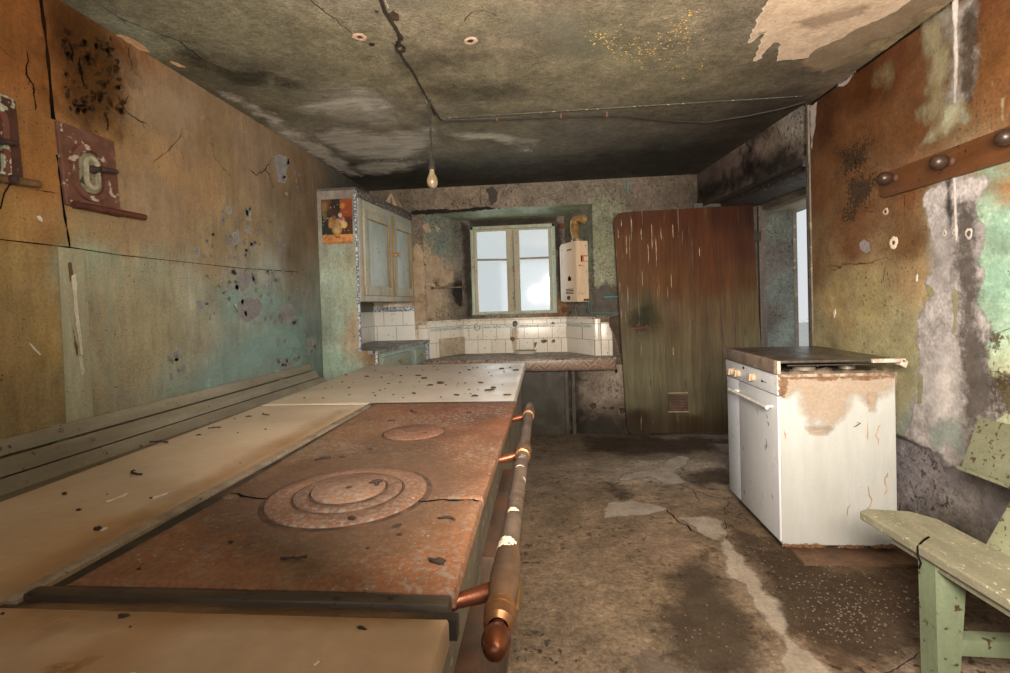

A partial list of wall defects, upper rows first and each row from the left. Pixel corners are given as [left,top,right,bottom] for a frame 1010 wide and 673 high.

crack [0,47,37,110]
water stain [54,7,126,130]
peeling [748,0,943,86]
water stain [923,0,979,142]
water stain [221,90,434,177]
peeling [809,102,817,148]
spalling [411,187,500,233]
water stain [833,134,878,224]
peeling [193,201,318,369]
water stain [904,175,1010,484]
peeling [603,500,667,518]
peeling [619,456,690,485]